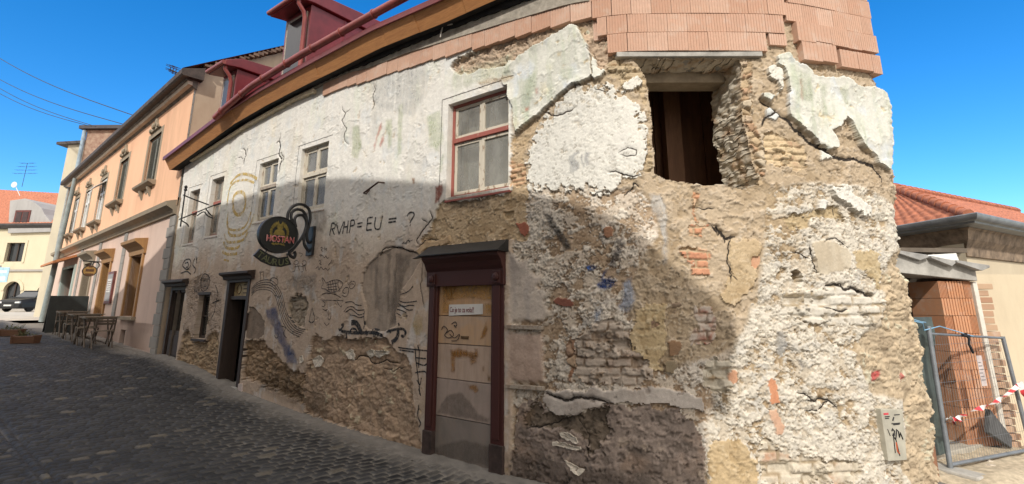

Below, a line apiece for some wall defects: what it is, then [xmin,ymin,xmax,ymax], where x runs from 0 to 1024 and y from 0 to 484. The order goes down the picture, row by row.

flaking render [421,20,649,246]
flaking render [740,52,894,178]
crack [760,102,882,183]
spalling [553,297,575,307]
spalling [679,224,712,277]
crack [697,207,736,283]
spalling [784,184,872,230]
crack [792,237,870,312]
spalling [779,239,887,329]
spalling [242,247,422,449]
spalling [511,302,864,484]
crack [797,392,837,411]